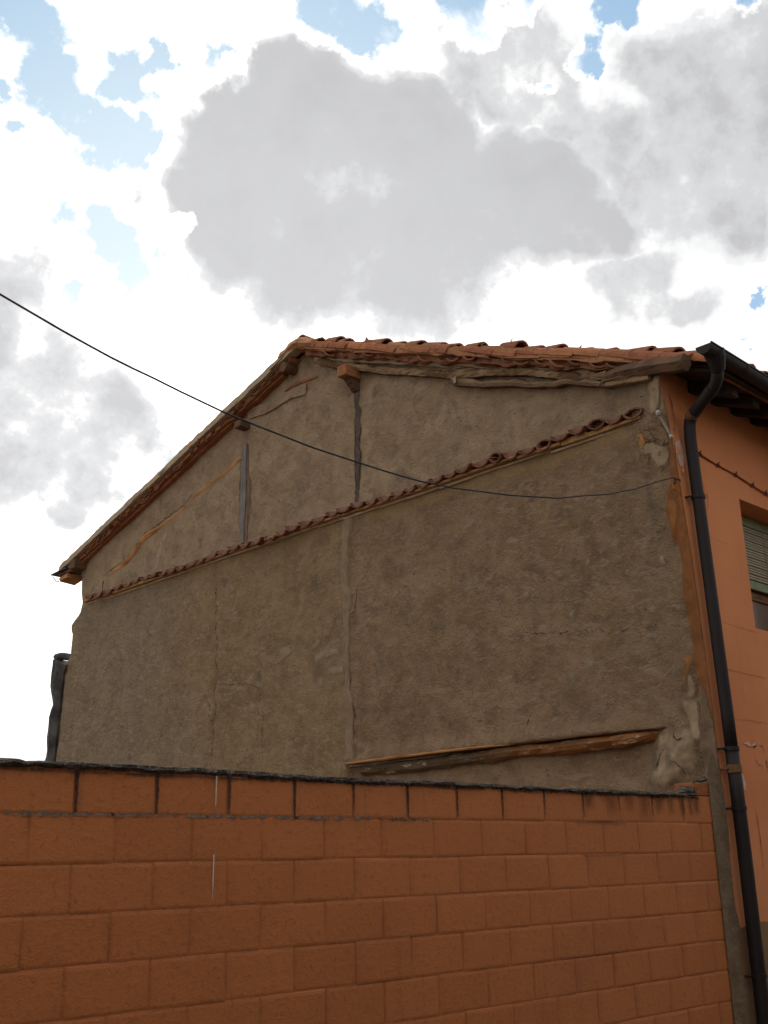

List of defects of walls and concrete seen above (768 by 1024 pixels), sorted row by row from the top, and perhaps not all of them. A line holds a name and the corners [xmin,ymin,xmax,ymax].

leakage [126,772,317,816]
leakage [425,786,671,816]